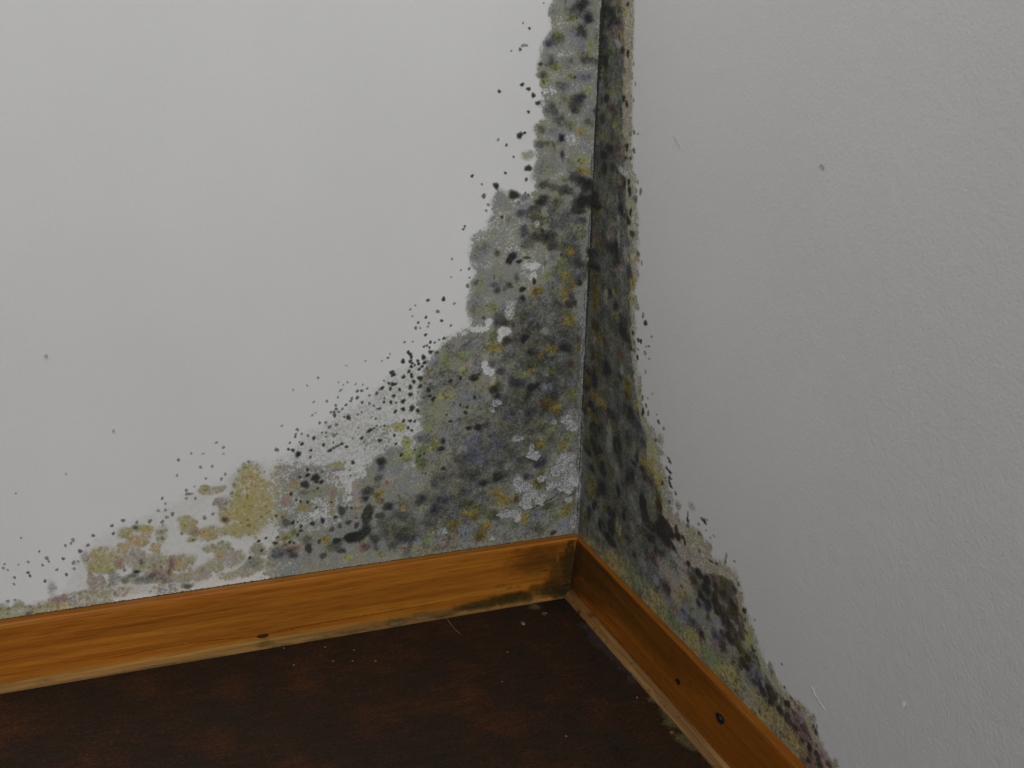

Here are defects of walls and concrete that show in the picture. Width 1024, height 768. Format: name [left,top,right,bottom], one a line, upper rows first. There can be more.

water stain [319,383,381,452]
water stain [368,380,406,414]
water stain [366,419,416,443]
water stain [401,0,839,768]
water stain [0,442,435,619]